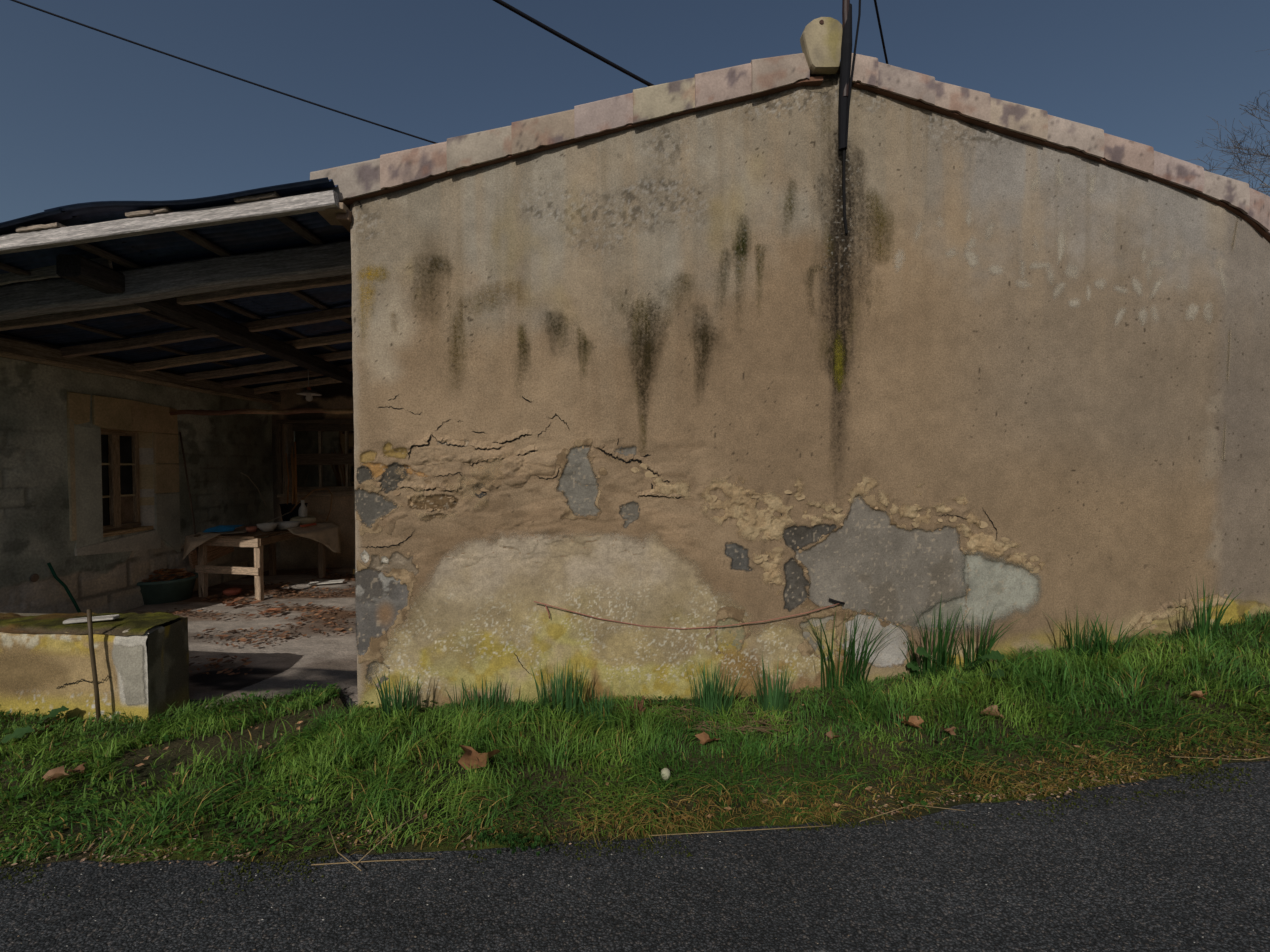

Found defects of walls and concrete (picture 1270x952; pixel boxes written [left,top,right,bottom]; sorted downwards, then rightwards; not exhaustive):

water stain [735,225,760,272]
water stain [826,130,888,425]
water stain [632,313,660,432]
water stain [694,324,713,377]
crack [378,394,690,499]
spalling [553,439,607,520]
spalling [348,442,502,689]
water stain [361,533,847,708]
spalling [614,446,1046,668]
crack [56,676,111,689]